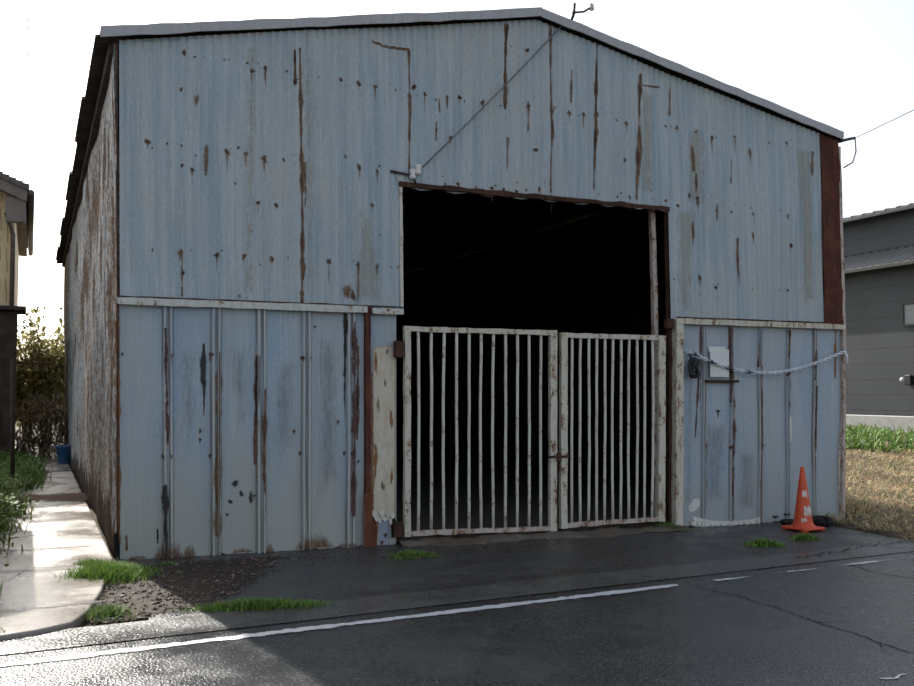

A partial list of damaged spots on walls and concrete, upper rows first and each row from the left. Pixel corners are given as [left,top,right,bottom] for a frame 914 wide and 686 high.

rust [282,48,307,303]
rust [500,23,512,117]
rust [538,24,556,194]
rust [567,43,599,195]
rust [616,73,678,200]
peeling [74,101,116,508]
rust [200,343,223,543]
rust [253,355,267,510]
rust [343,313,393,547]